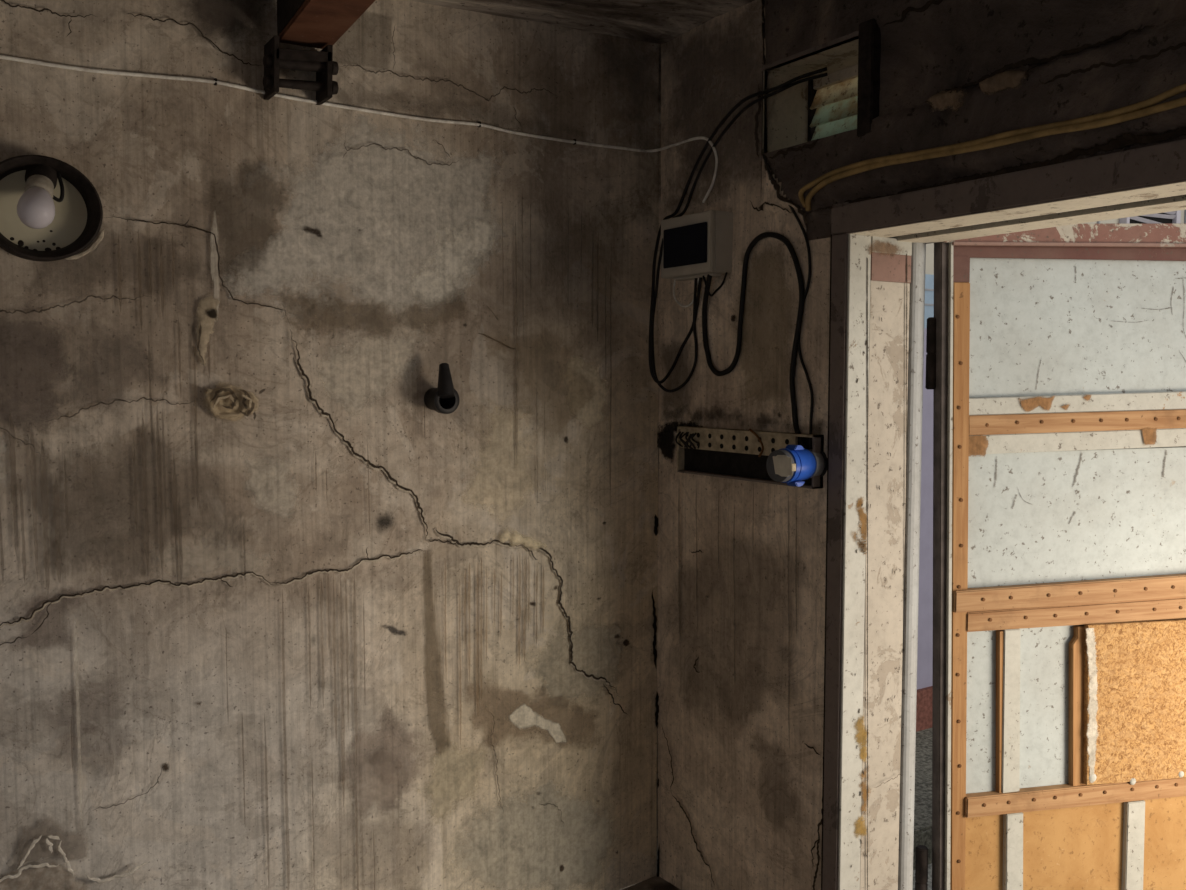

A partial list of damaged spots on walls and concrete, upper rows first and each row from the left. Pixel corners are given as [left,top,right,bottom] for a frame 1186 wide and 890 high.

crack [2,0,96,36]
crack [128,13,259,66]
spalling [926,90,965,111]
crack [751,0,1186,230]
spalling [979,70,1027,93]
leakage [211,117,504,322]
leakage [319,324,425,412]
crack [0,217,627,714]
crack [652,514,660,536]
flaking render [510,705,566,743]
crack [652,592,715,885]
flaking render [0,822,149,890]